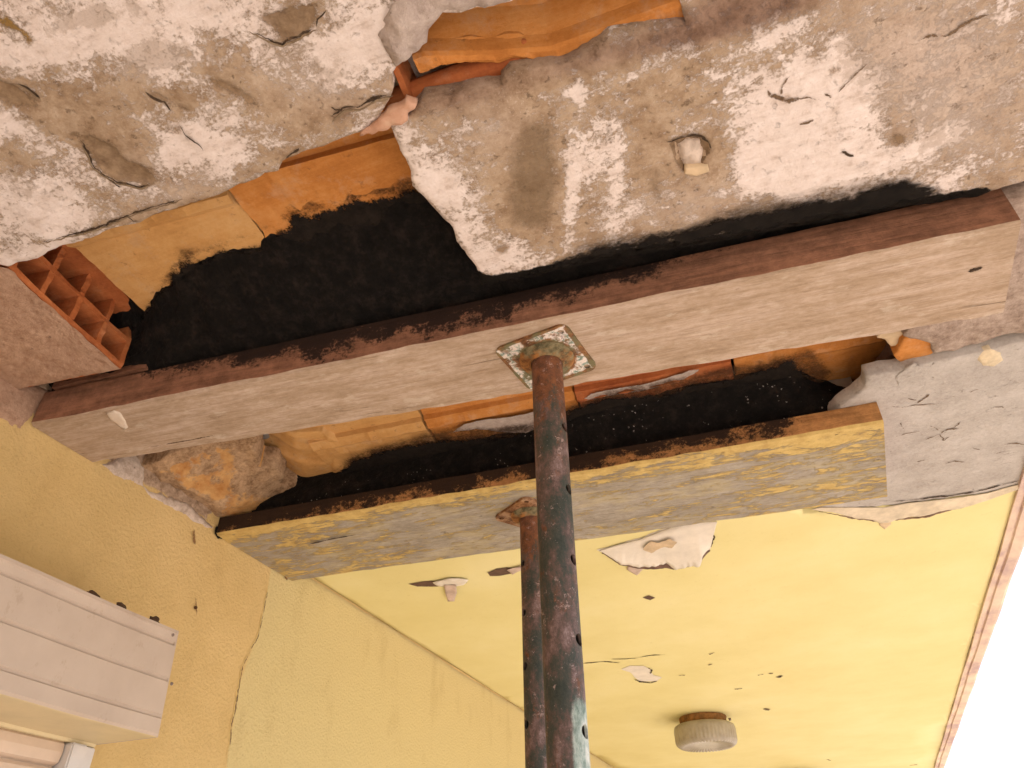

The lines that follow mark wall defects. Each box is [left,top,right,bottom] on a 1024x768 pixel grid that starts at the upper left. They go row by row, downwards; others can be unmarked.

crack [250,11,326,47]
spalling [262,4,316,40]
crack [331,95,392,122]
crack [767,64,867,125]
crack [39,140,182,245]
damp [515,128,552,226]
spalling [668,134,711,176]
spalling [258,427,351,477]
crack [892,395,1024,463]
peeling [811,480,1022,529]
peeling [488,566,521,576]
peeling [598,521,717,575]